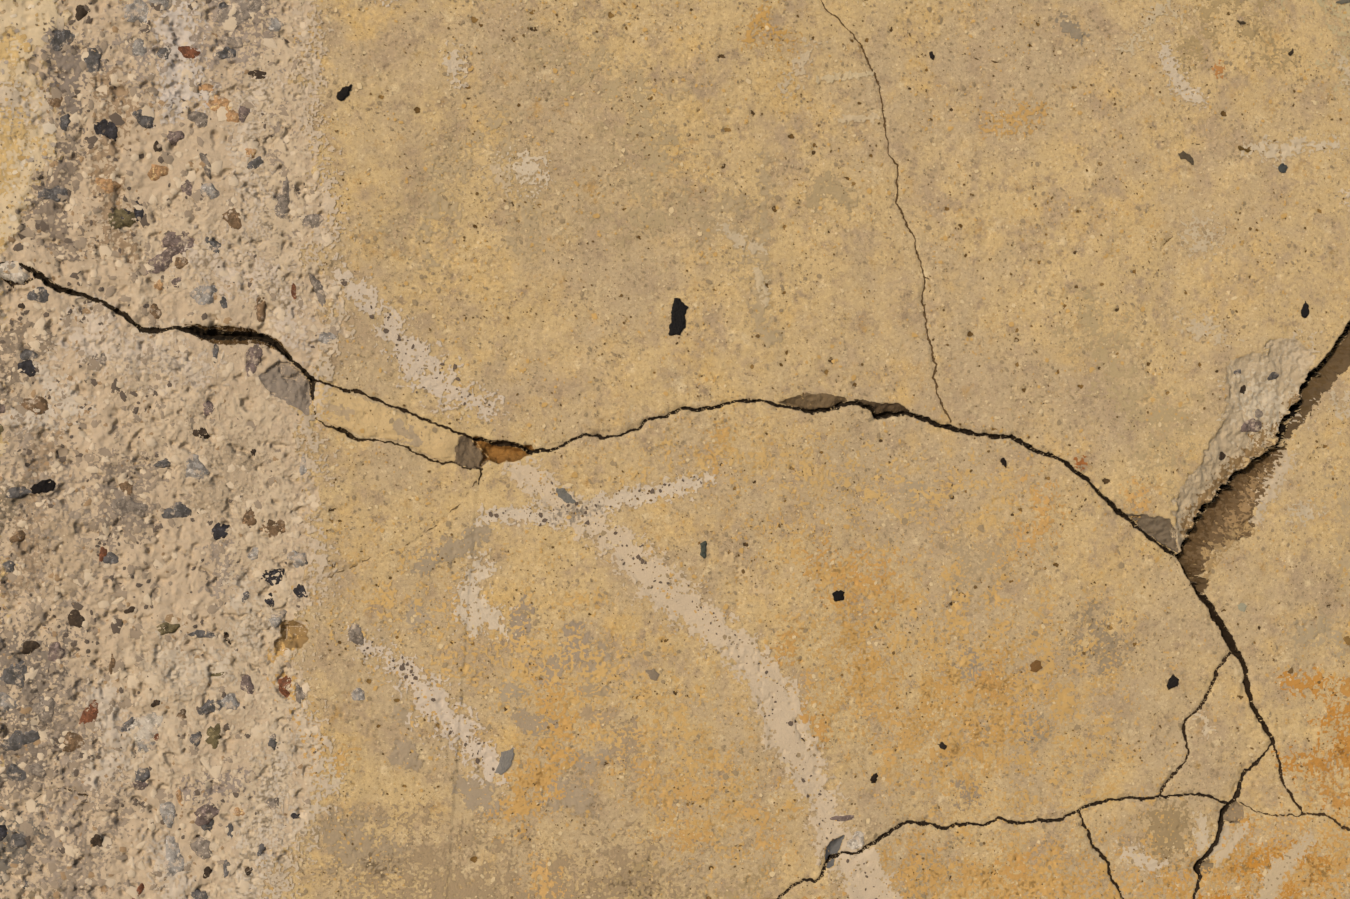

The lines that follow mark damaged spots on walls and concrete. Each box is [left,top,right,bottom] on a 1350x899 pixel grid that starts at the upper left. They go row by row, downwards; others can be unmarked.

crack [2,0,1242,557]
spalling [1127,301,1350,593]
crack [1250,322,1350,463]
crack [777,560,1350,899]